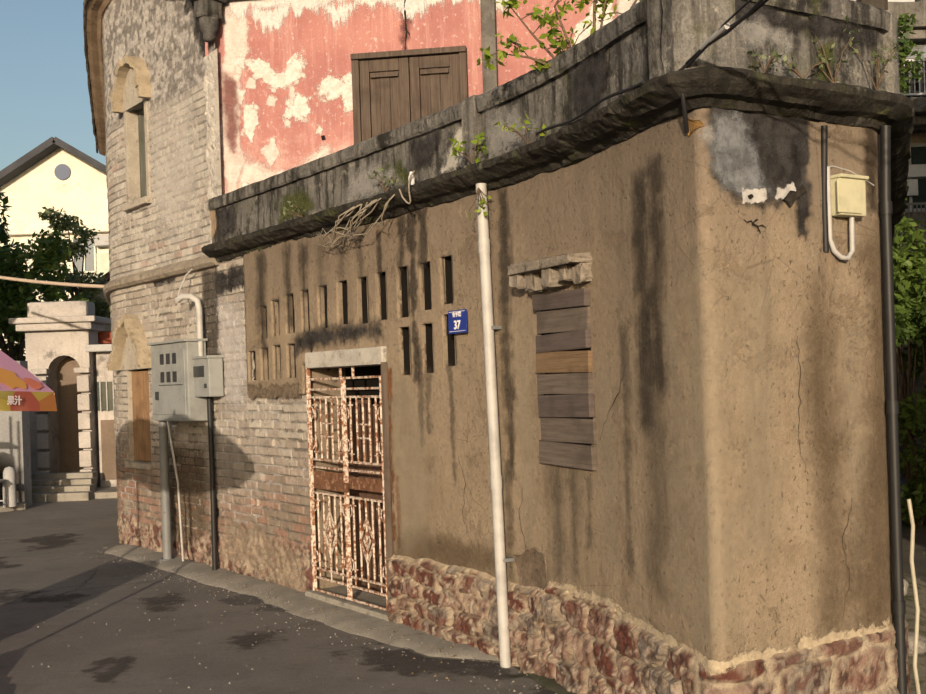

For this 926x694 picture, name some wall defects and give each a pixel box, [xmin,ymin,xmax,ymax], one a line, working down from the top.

crack [402,0,410,50]
peeling [220,0,480,193]
leakage [348,167,395,200]
leakage [410,129,439,172]
leakage [441,127,464,173]
leakage [488,113,536,156]
leakage [702,108,812,236]
flaking render [783,184,807,207]
leakage [632,163,664,423]
rust [387,369,401,545]
flaking render [513,547,679,649]